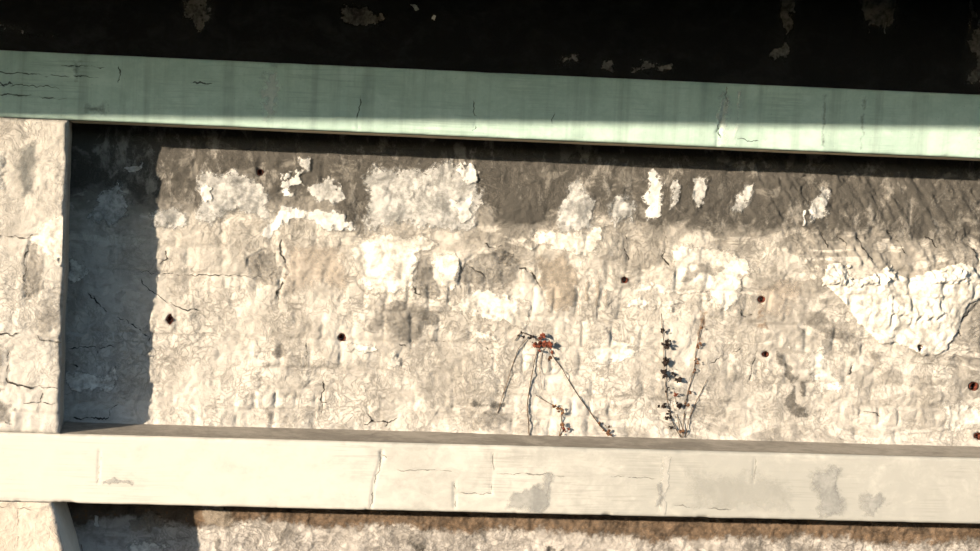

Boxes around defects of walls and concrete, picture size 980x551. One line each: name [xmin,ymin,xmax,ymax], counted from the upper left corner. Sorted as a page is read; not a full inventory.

crack [0,65,121,100]
peeling [149,157,484,294]
leakage [642,169,708,219]
leakage [802,186,830,226]
crack [9,234,37,296]
peeling [452,289,531,332]
peeling [467,331,496,341]
crack [369,455,564,508]